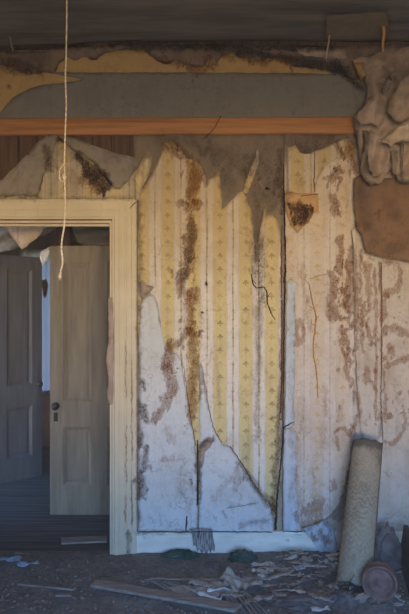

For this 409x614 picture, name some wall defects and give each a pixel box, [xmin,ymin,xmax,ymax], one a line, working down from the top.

leakage [74,151,112,197]
leakage [281,201,314,226]
leakage [138,171,203,424]
crack [139,165,302,533]
leakage [328,236,367,384]